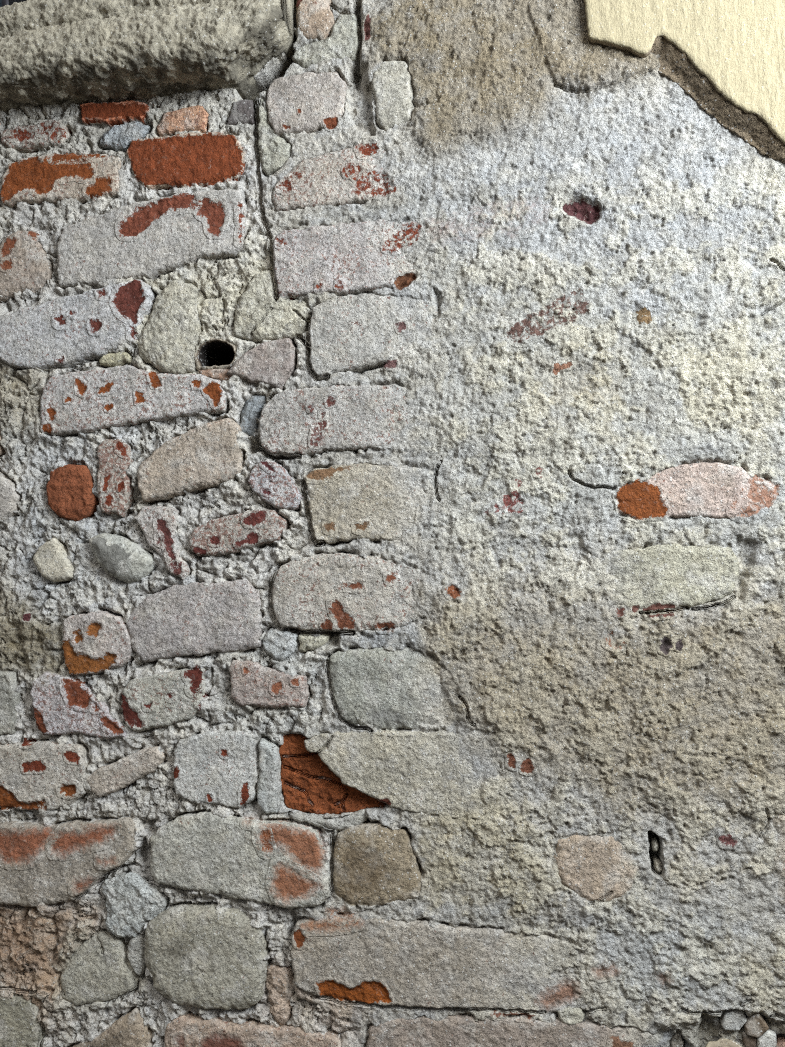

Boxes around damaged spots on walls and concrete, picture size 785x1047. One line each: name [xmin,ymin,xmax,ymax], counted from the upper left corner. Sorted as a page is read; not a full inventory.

flaking render [583,0,785,163]
crack [760,298,785,316]